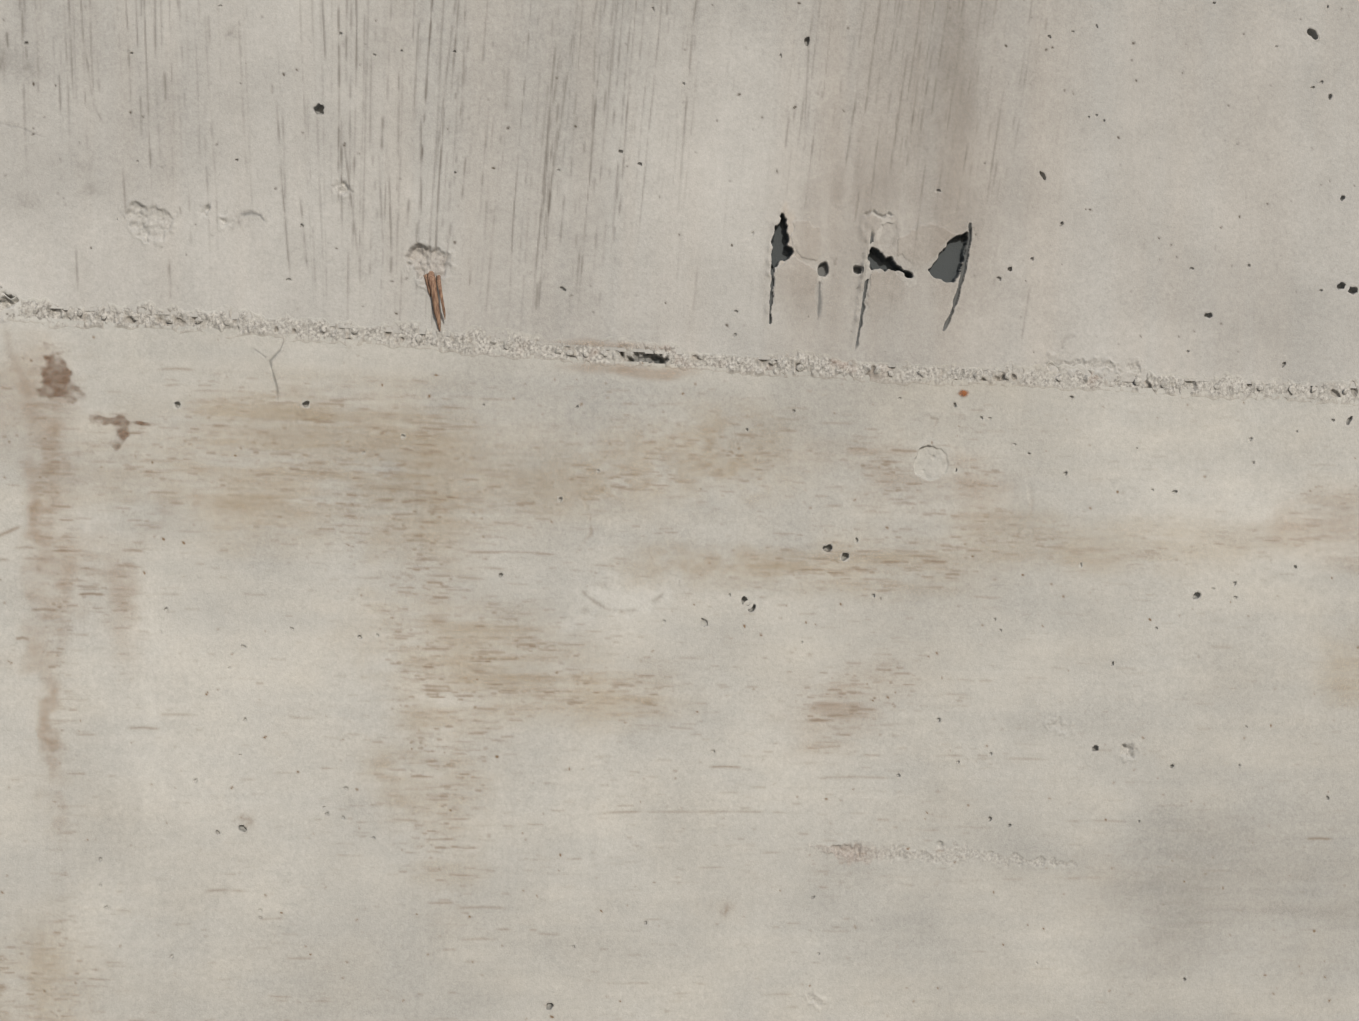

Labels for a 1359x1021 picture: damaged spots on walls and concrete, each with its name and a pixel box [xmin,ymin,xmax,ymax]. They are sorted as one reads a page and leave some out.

spalling [117,192,184,252]
peeling [771,216,959,329]
corrosion [43,356,71,396]